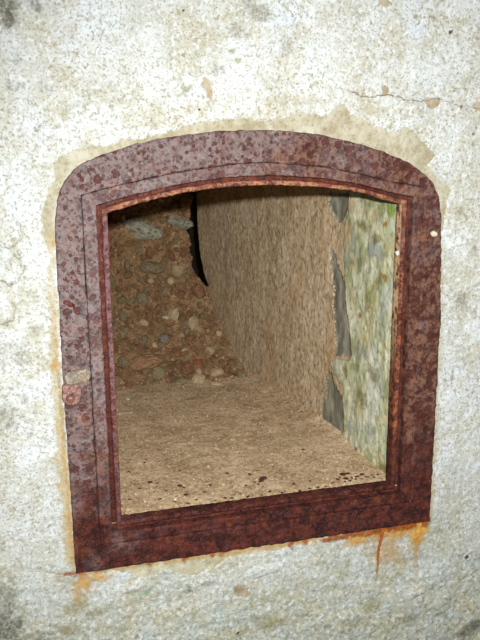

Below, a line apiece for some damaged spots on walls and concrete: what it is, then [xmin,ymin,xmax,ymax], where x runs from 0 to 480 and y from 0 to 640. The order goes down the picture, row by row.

rust [52,387,74,563]
rust [211,521,429,566]